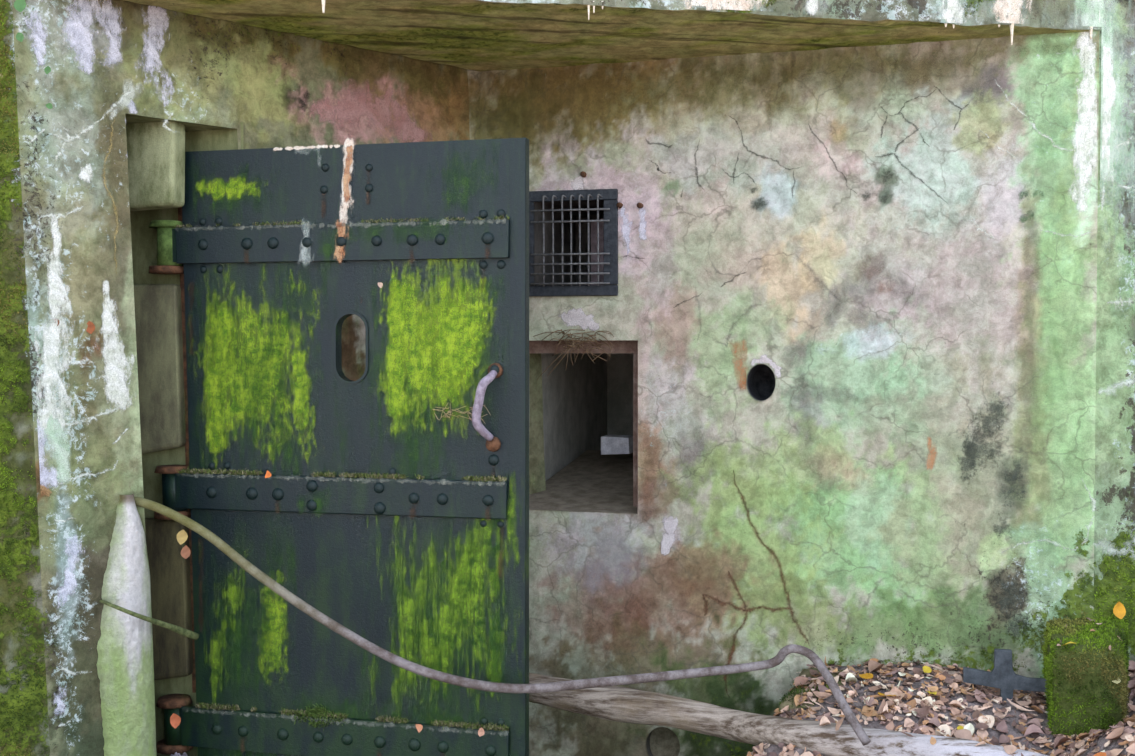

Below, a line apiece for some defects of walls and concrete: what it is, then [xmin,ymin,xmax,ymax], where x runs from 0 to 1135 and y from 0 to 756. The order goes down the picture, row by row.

water stain [26,13,47,65]
water stain [79,165,92,181]
water stain [66,0,121,73]
water stain [113,86,137,116]
water stain [142,6,172,106]
crack [647,118,795,197]
crack [877,87,1021,197]
water stain [35,217,74,486]
water stain [101,281,134,409]
water stain [960,392,1025,506]
crack [703,471,809,696]